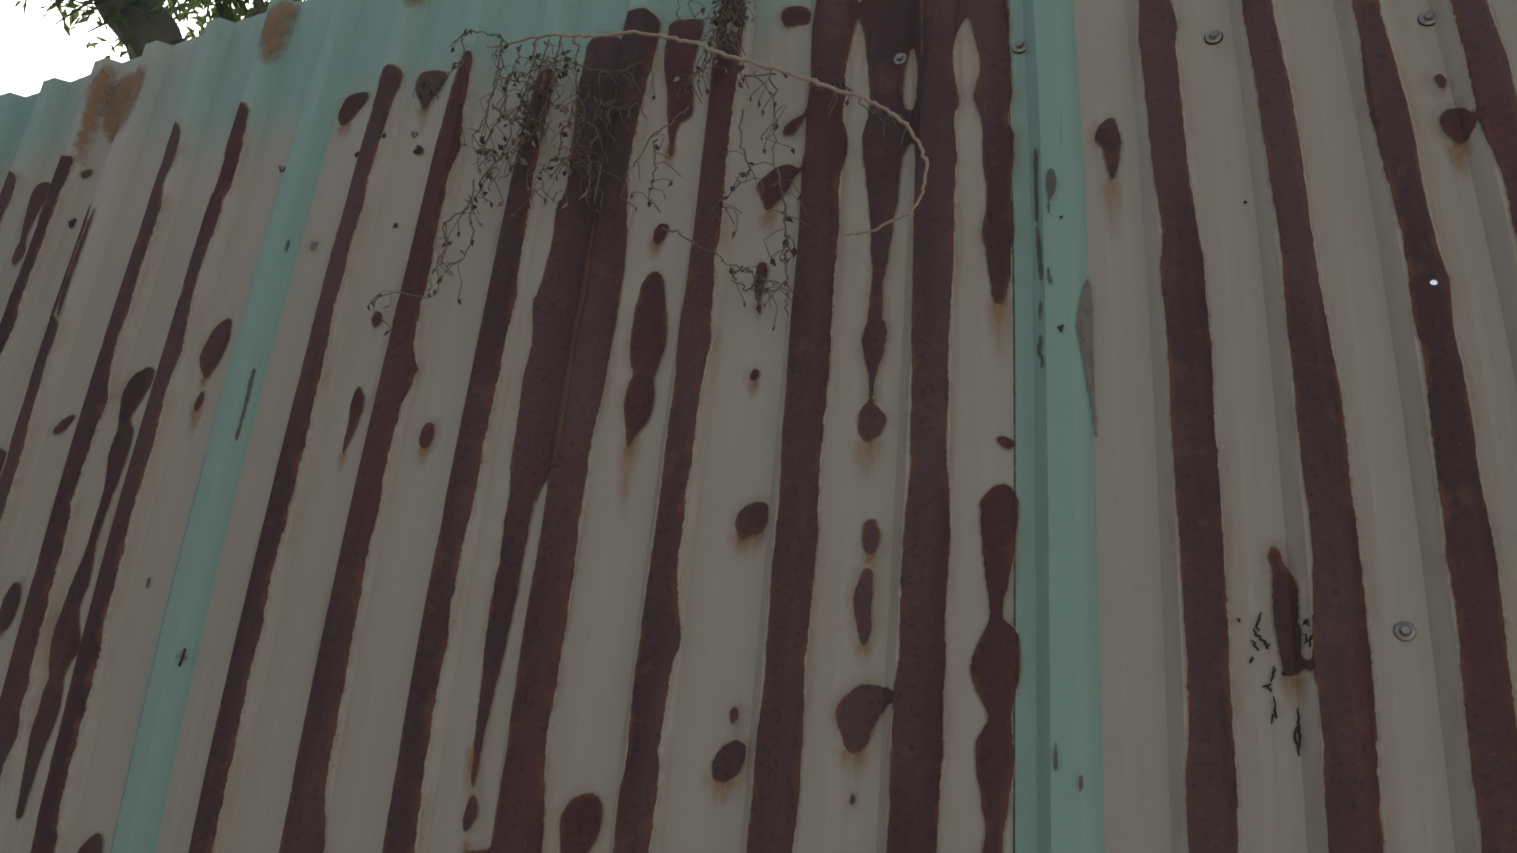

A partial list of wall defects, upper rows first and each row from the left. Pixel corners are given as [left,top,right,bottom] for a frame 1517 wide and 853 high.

corrosion [0,68,249,853]
corrosion [188,50,472,853]
corrosion [382,0,745,853]
corrosion [712,0,1020,853]
corrosion [1137,0,1239,853]
corrosion [1242,0,1385,853]
corrosion [1352,0,1517,853]